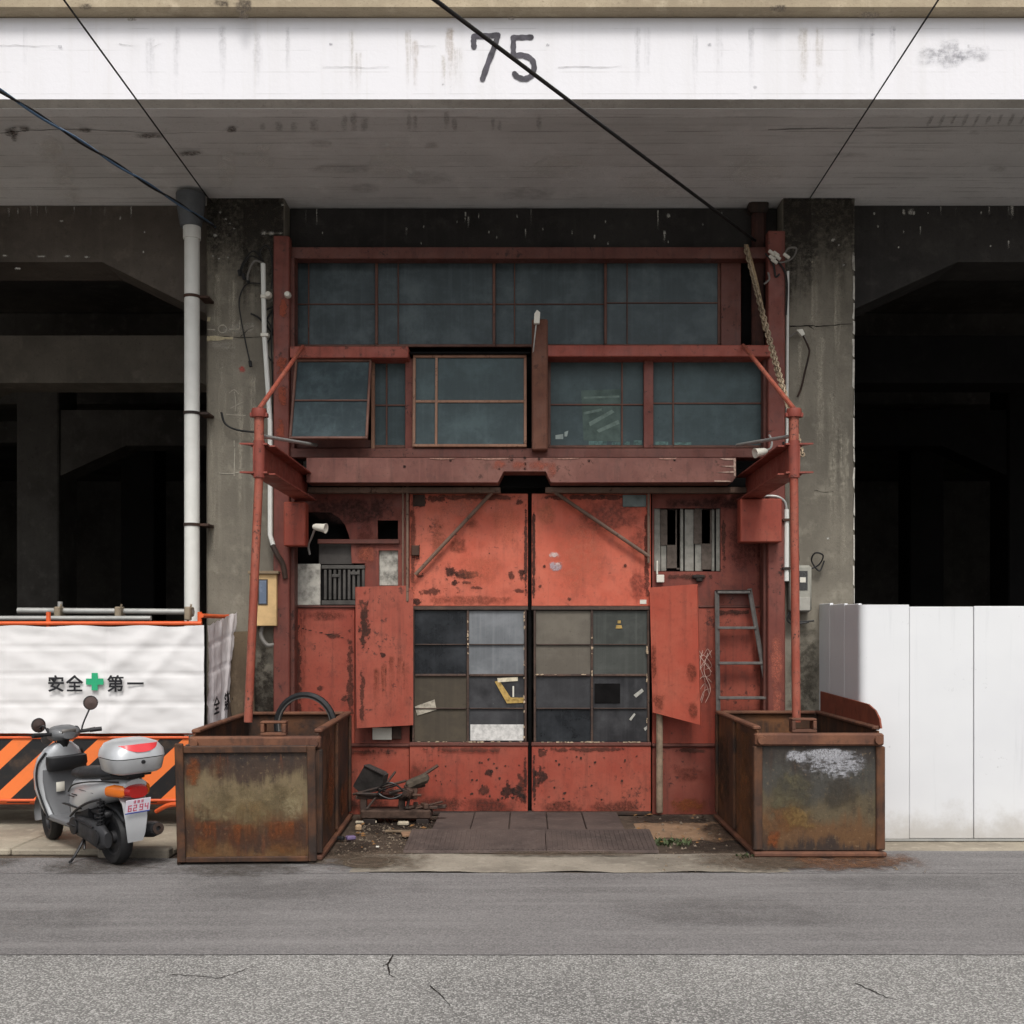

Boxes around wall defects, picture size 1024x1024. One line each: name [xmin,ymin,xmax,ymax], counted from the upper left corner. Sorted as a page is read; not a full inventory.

corrosion [346,630,354,714]
corrosion [478,747,624,804]